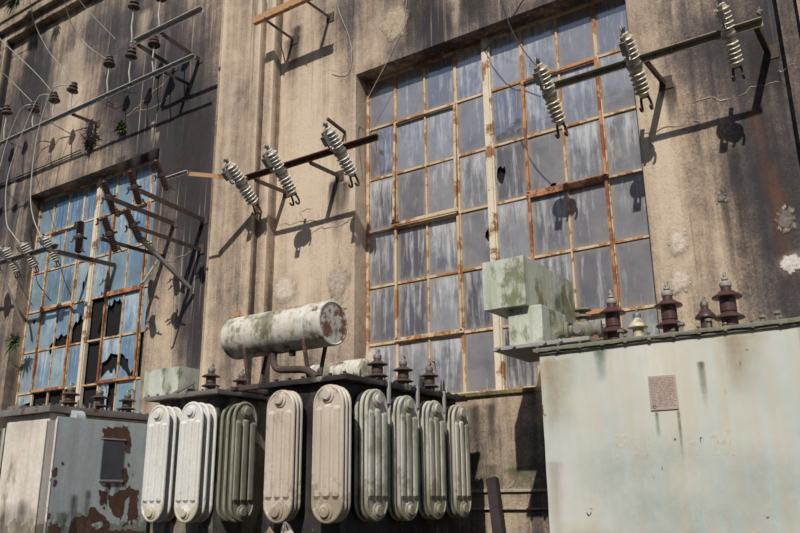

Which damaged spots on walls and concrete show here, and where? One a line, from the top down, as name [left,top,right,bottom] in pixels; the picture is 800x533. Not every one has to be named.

crack [643,63,795,134]
crack [280,208,354,248]
flaking render [775,205,796,234]